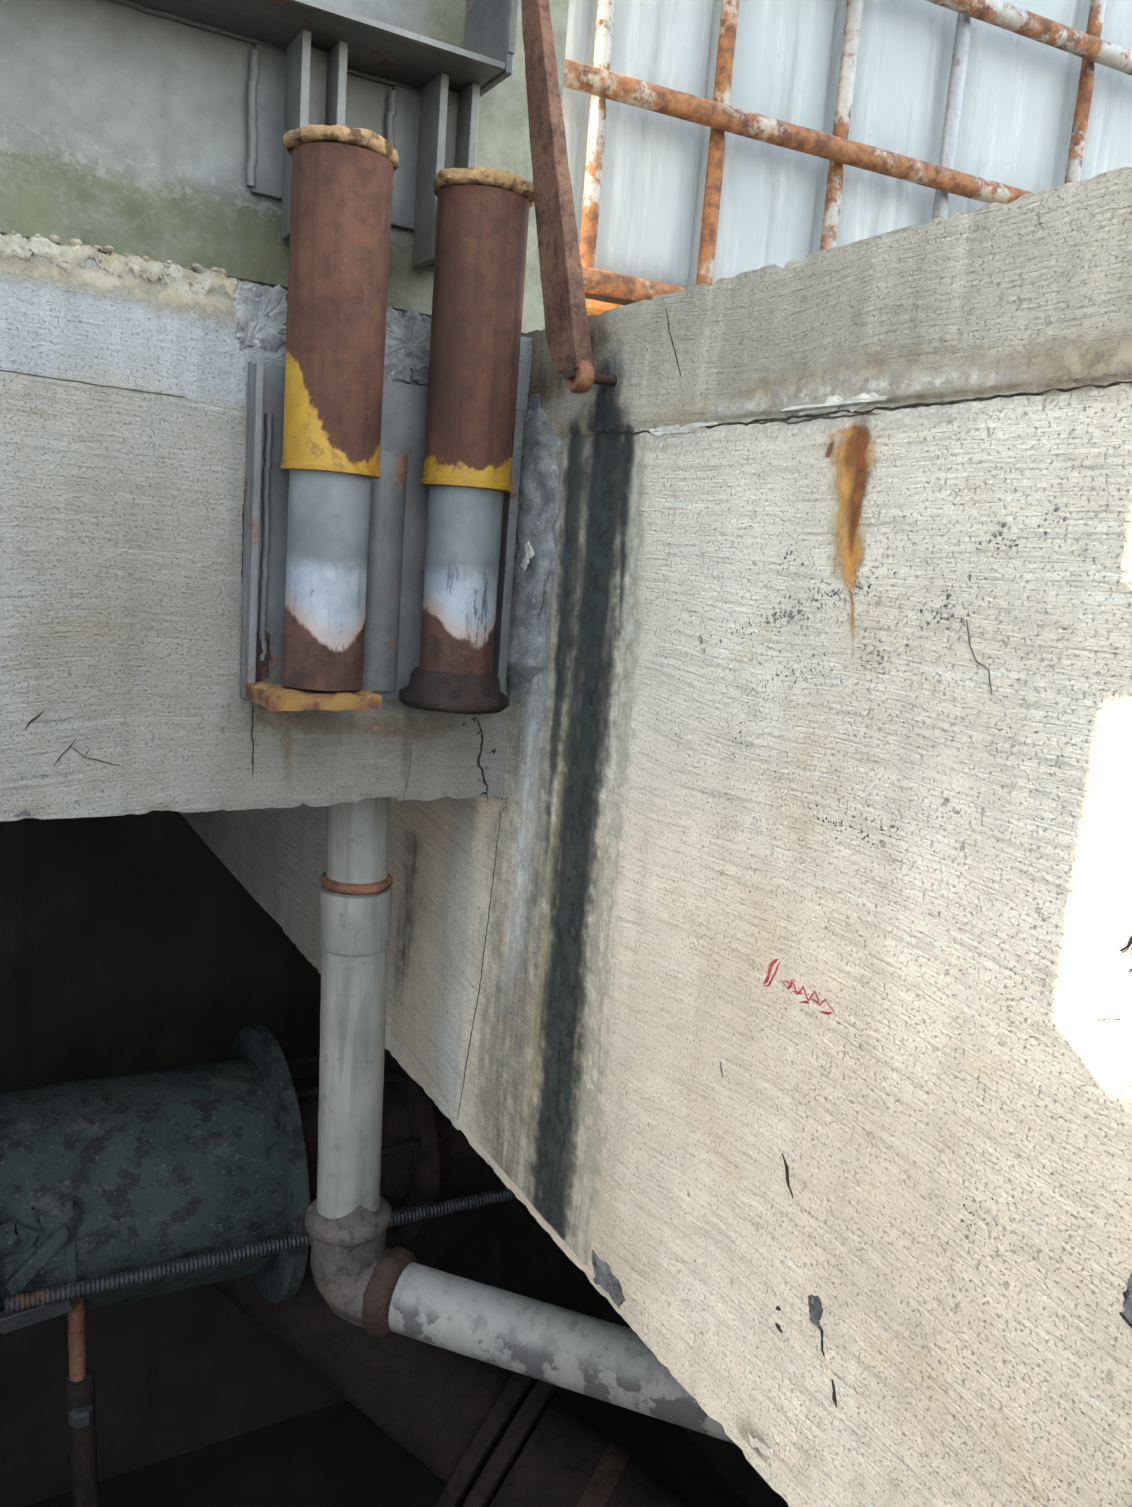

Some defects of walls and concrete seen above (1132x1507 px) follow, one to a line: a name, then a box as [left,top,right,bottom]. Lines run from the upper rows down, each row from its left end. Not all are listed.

crack [622,336,1132,445]
corrosion [826,425,870,633]
crack [53,739,119,767]
water stain [485,361,642,1265]
spalling [1117,935,1132,972]
spalling [592,1249,626,1309]
spalling [1119,1274,1132,1328]